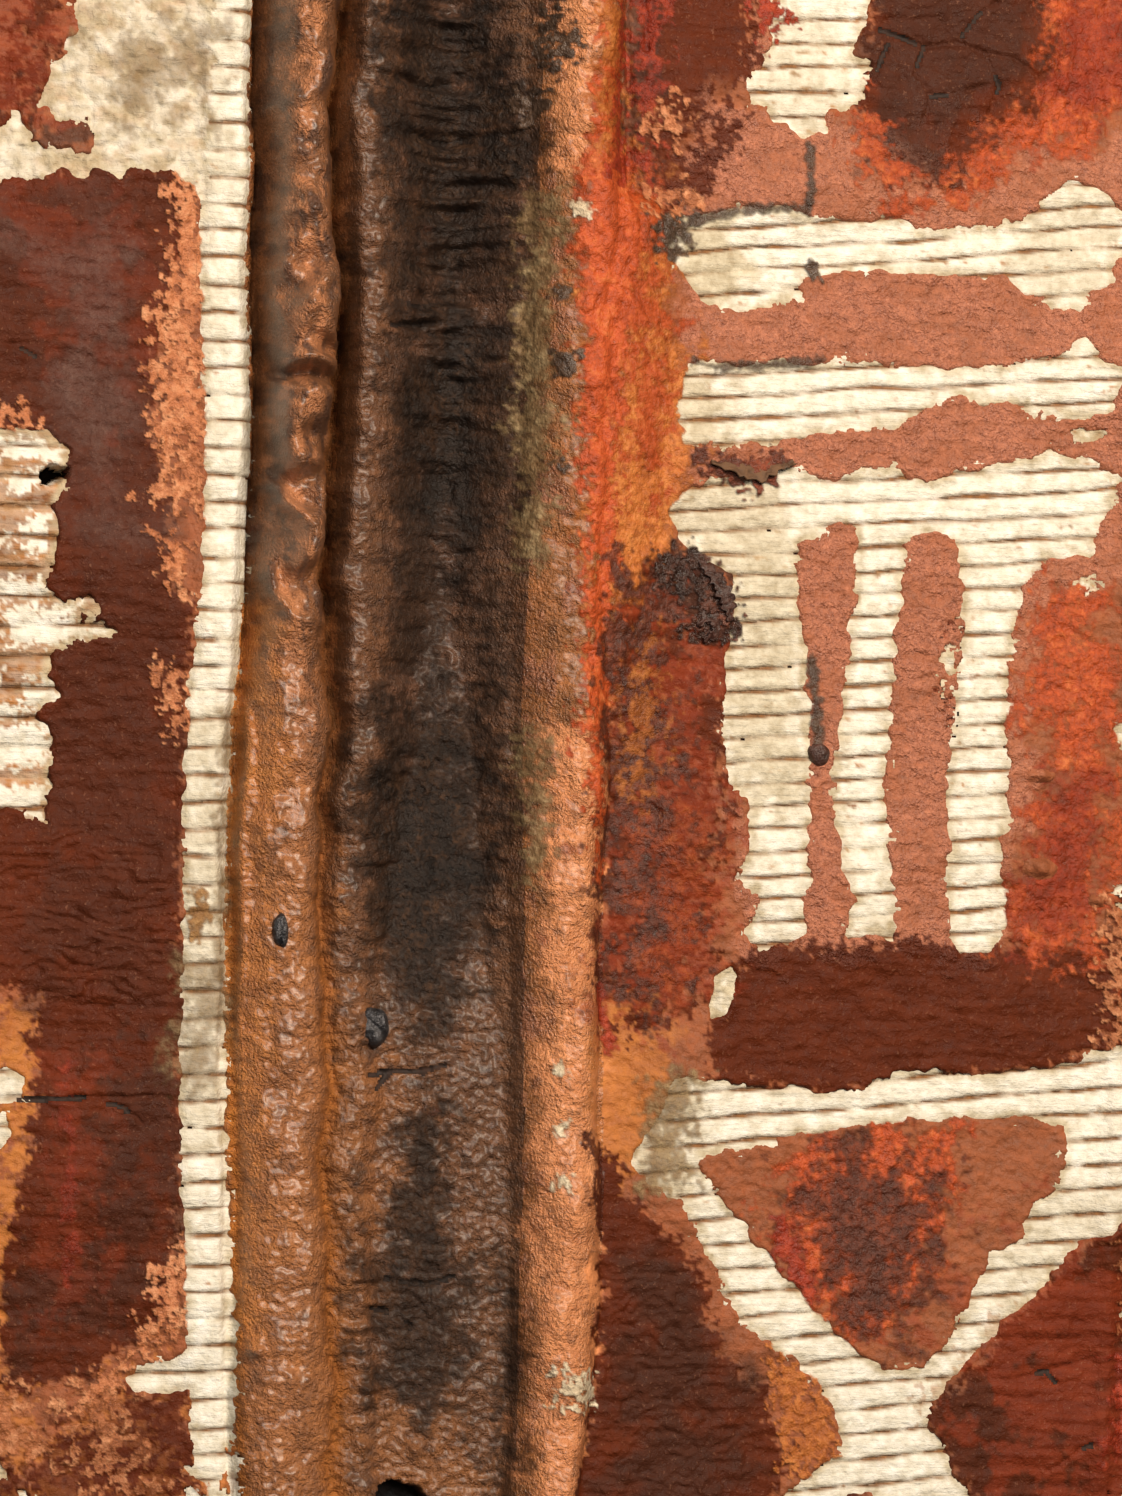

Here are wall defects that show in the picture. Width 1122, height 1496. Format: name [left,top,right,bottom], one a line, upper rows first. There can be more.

damp [446,0,579,571]
crack [875,27,949,99]
corrosion [846,0,1122,218]
crack [993,75,1002,95]
peeling [0,0,255,1496]
damp [361,360,560,891]
corrosion [561,0,726,1056]
corrosion [1003,582,1122,975]
damp [391,1100,456,1275]
corrosion [741,1118,976,1359]
peeling [631,884,1122,1496]